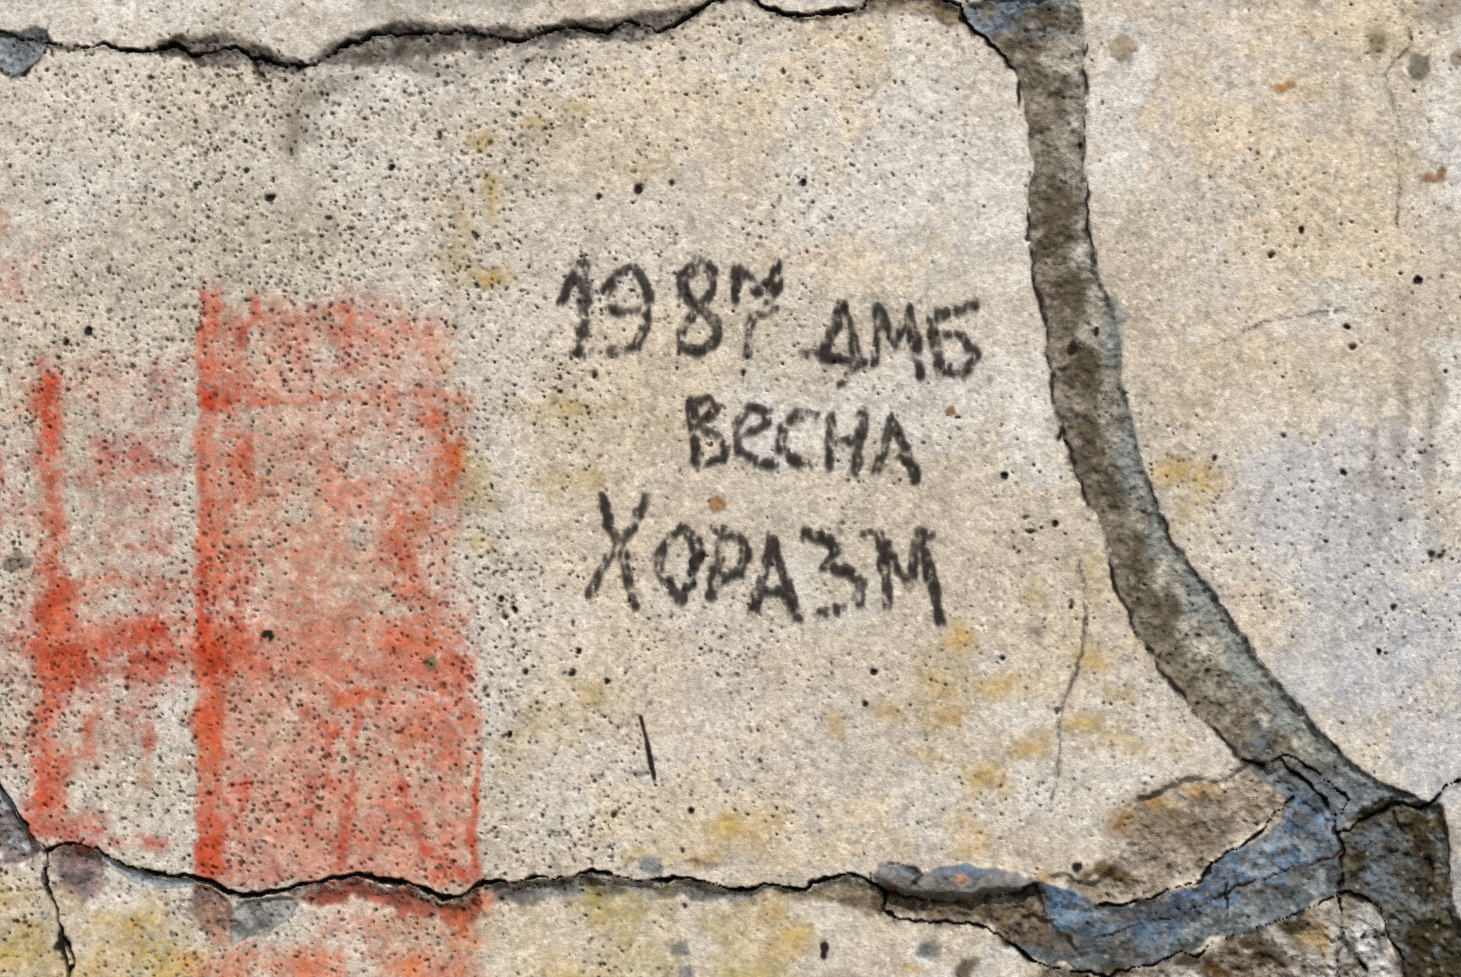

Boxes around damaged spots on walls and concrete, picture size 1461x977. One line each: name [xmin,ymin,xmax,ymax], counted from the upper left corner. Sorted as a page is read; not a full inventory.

crack [0,0,868,94]
crack [942,0,1461,977]
crack [41,842,1208,977]